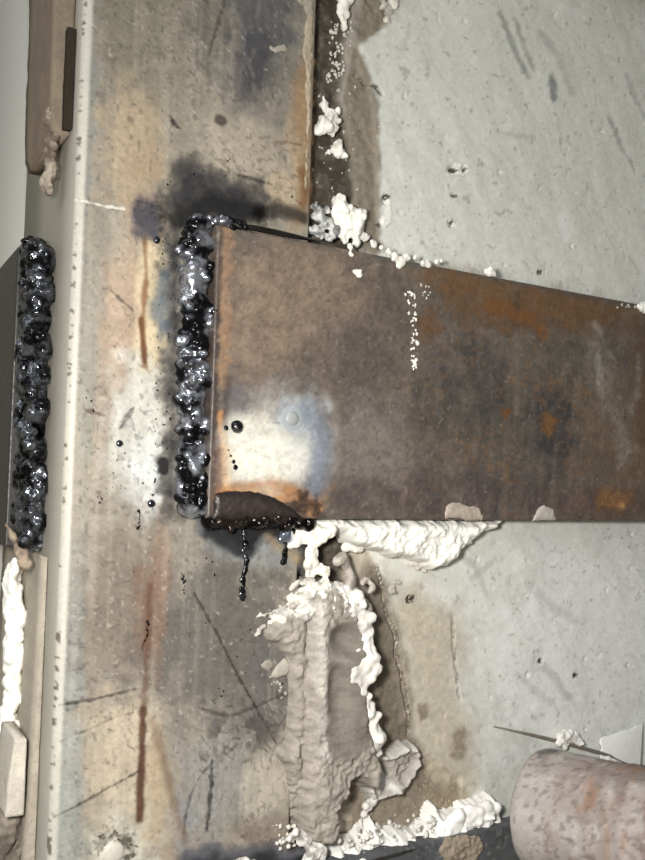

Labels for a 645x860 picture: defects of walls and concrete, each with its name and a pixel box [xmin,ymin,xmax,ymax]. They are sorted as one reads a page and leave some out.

corrosion [139,275,148,368]
corrosion [137,706,146,821]